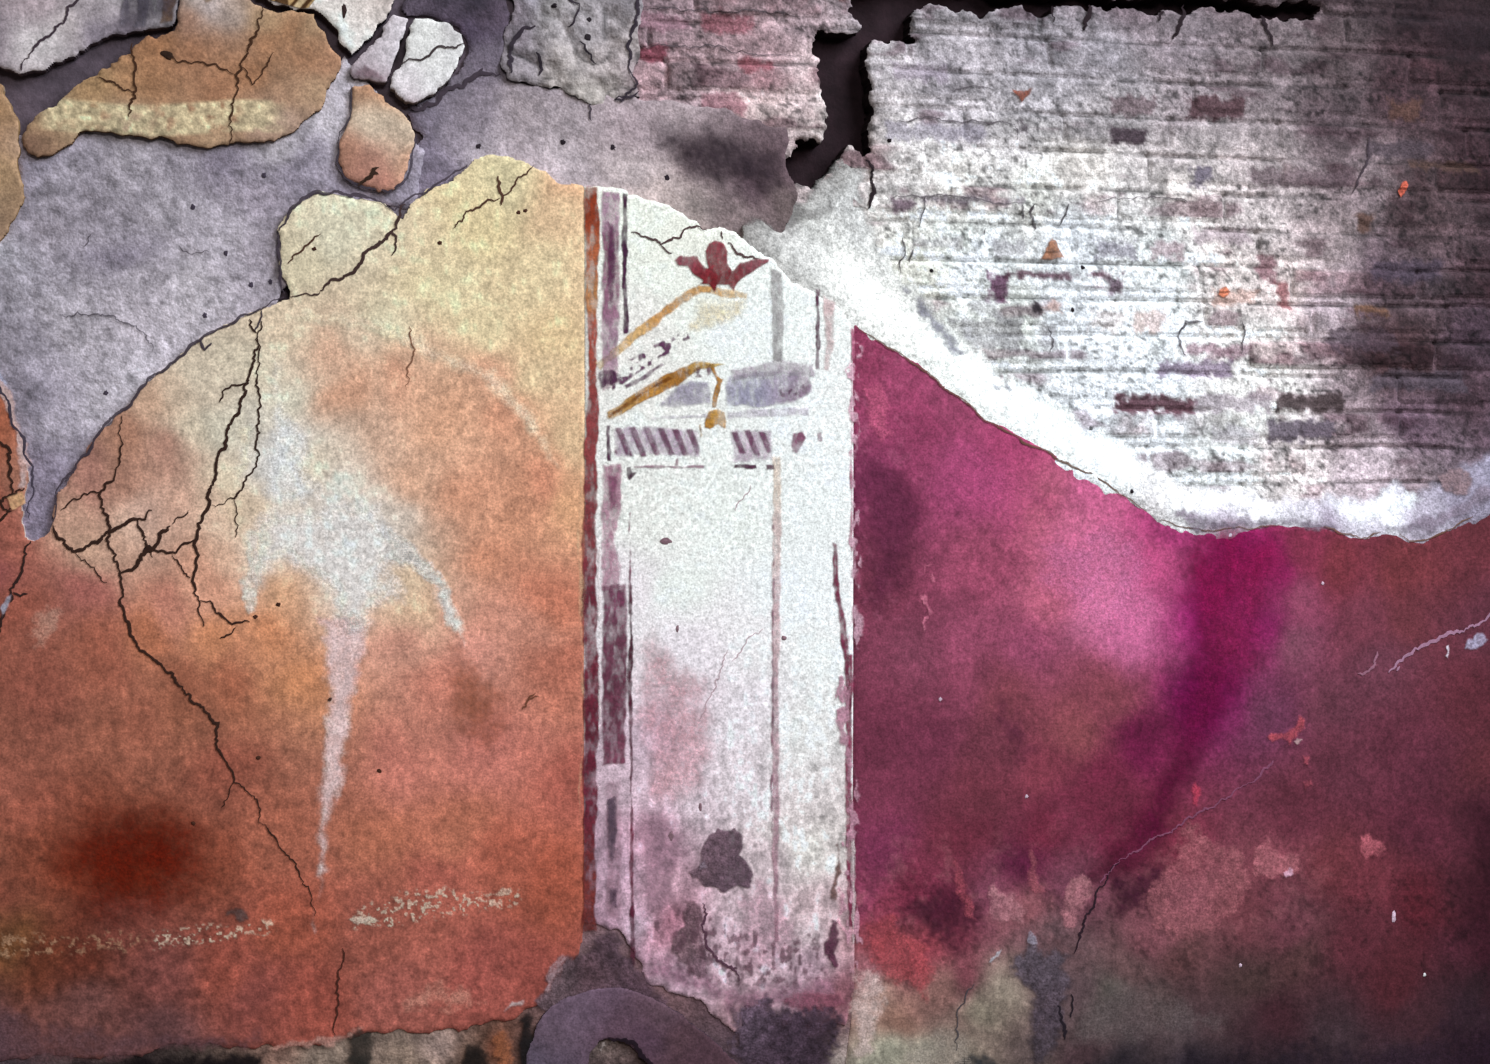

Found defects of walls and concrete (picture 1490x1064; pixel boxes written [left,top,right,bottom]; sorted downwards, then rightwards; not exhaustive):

flaking render [0,0,1310,541]
crack [0,0,801,916]
spalling [1438,468,1472,495]
peeling [852,606,863,644]
water stain [242,502,462,872]
water stain [350,889,519,926]
crack [1074,863,1119,953]
water stain [156,921,272,945]
crack [954,987,973,1051]
crack [1057,994,1074,1040]
spalling [588,1039,647,1064]
water stain [956,1055,995,1064]